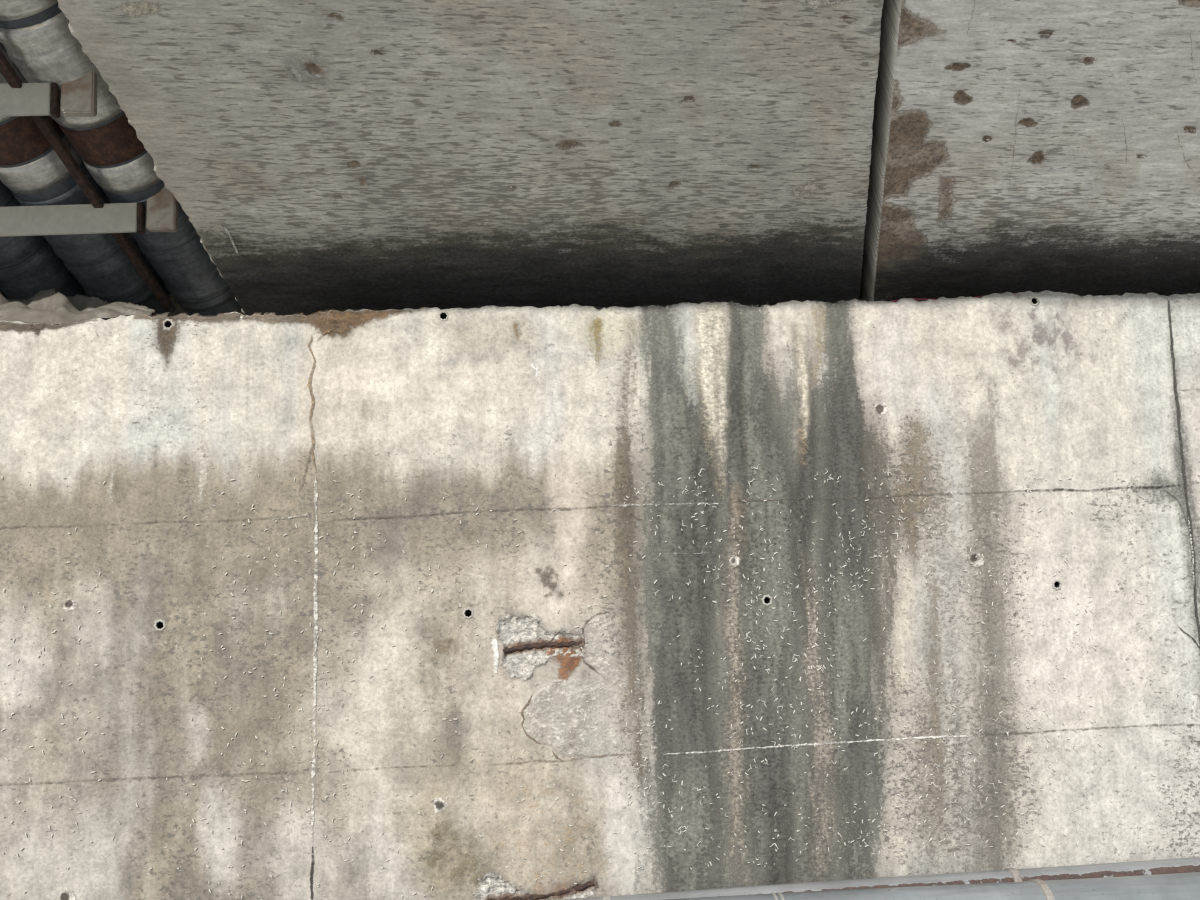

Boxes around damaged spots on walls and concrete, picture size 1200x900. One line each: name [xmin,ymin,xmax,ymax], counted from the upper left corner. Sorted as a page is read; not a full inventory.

crack [299,328,335,491]
damp [134,218,1200,892]
peeling [623,467,950,799]
spalling [496,612,1103,870]
spalling [921,529,1016,594]
crack [1016,301,1200,648]
crack [308,846,316,899]
spalling [475,872,598,900]